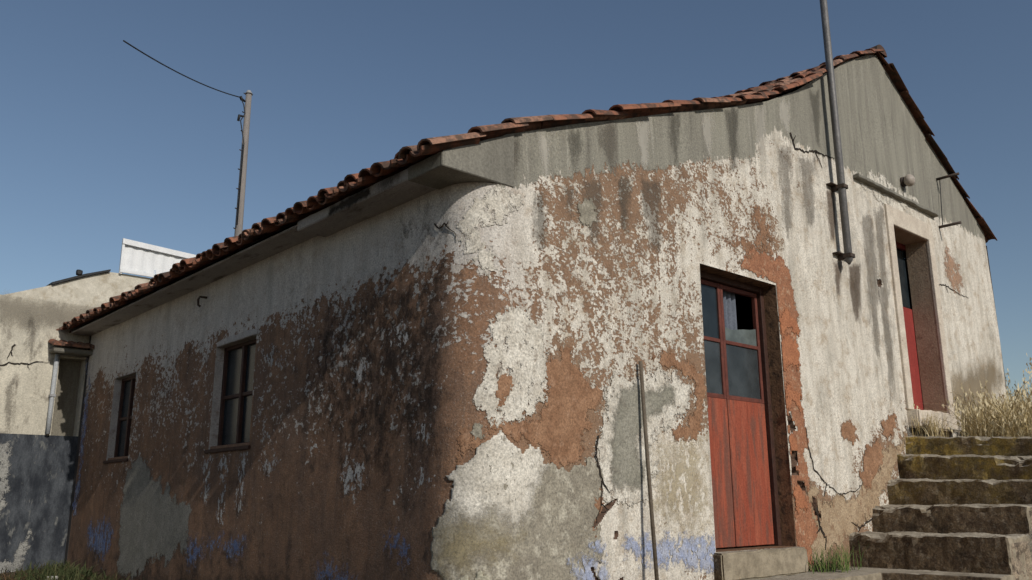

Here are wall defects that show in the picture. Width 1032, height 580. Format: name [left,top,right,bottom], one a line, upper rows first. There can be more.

crack [790,132,834,167]
peeling [944,246,964,294]
crack [1,344,48,368]
peeling [353,357,370,385]
spalling [722,202,908,570]
peeling [86,455,246,580]
peeling [341,456,367,495]
peeling [430,305,716,580]
crack [595,435,610,523]
crack [806,429,872,550]